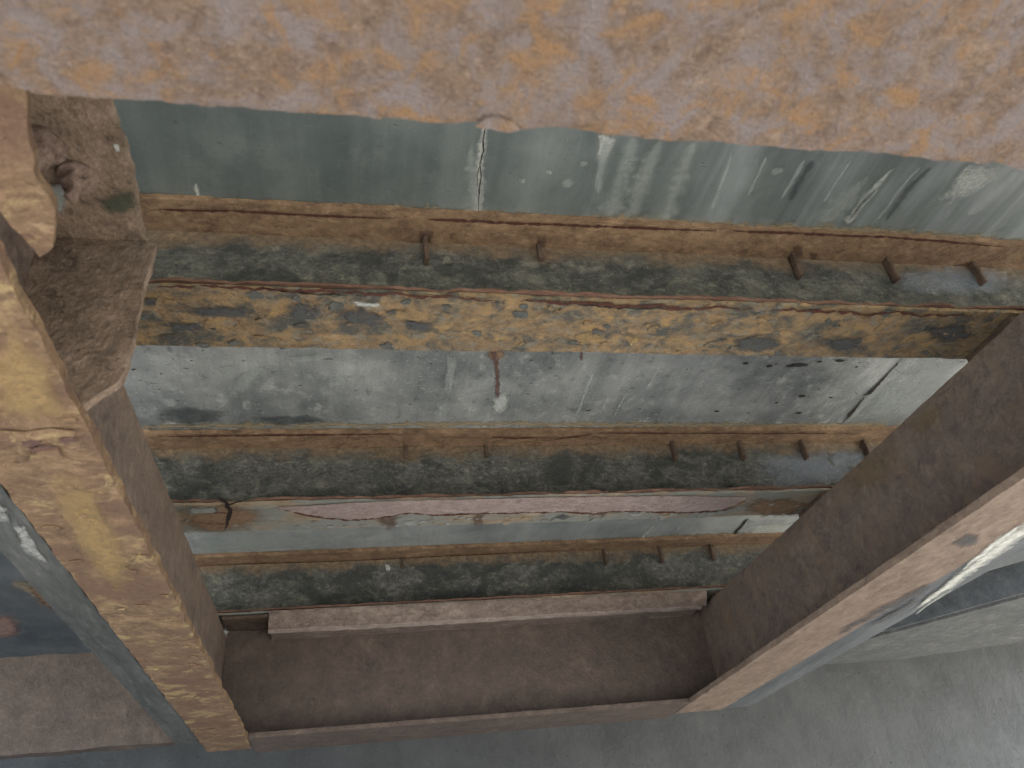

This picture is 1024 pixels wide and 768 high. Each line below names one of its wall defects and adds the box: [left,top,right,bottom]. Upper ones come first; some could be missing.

corrosion [476,116,520,133]
crack [431,129,708,231]
water stain [846,171,891,223]
water stain [947,167,996,199]
crack [163,209,390,219]
crack [736,231,1007,248]
corrosion [488,351,507,412]
crack [493,360,901,441]
crack [165,431,408,439]
crack [197,498,245,531]